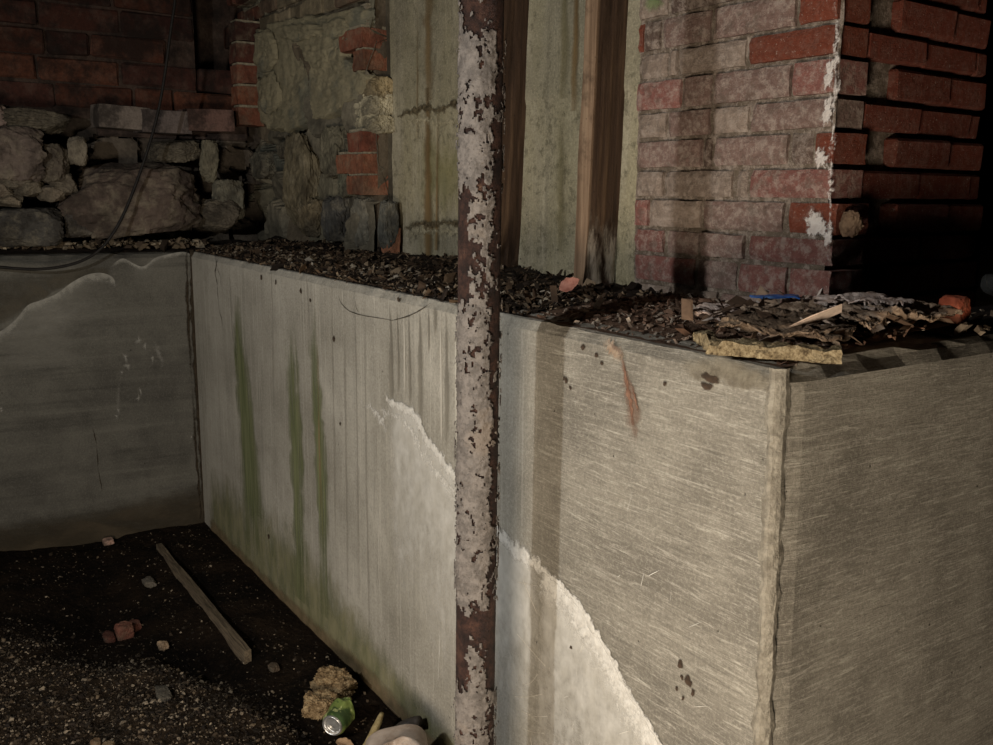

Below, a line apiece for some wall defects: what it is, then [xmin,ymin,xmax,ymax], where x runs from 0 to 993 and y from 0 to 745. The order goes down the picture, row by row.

efflorescence [822,21,840,139]
efflorescence [805,147,833,246]
damp [0,270,115,336]
damp [117,252,189,269]
corrosion [607,341,639,429]
damp [0,318,408,720]
damp [370,312,457,630]
efflorescence [495,525,662,745]